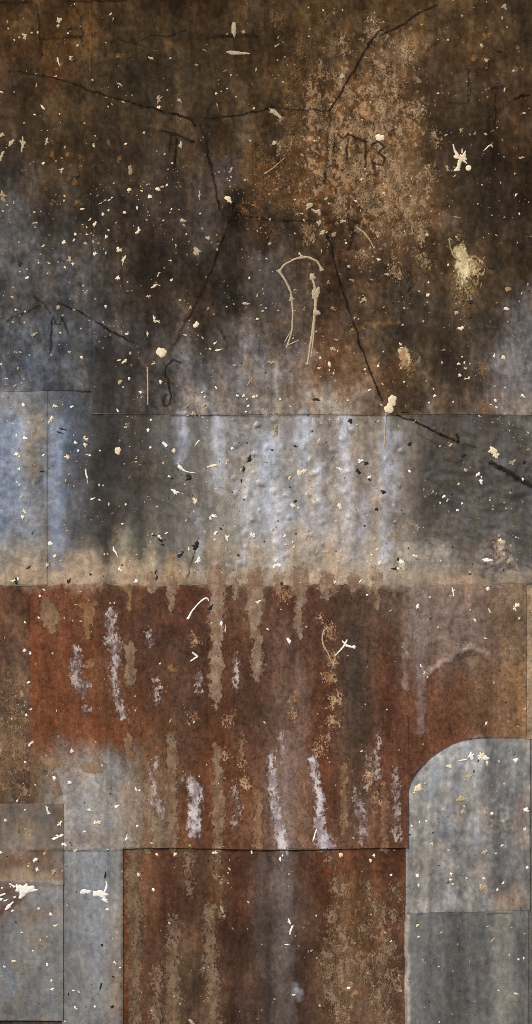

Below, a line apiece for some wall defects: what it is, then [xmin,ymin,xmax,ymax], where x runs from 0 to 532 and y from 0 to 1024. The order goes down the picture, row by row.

crack [451,68,530,128]
crack [4,0,470,445]
damp [182,147,299,324]
crack [489,462,532,487]
damp [0,318,532,1024]